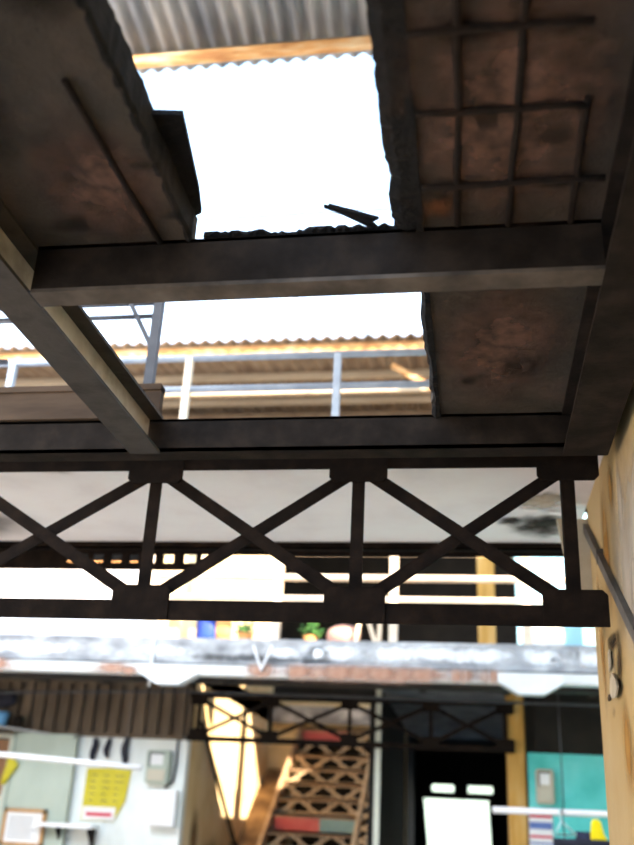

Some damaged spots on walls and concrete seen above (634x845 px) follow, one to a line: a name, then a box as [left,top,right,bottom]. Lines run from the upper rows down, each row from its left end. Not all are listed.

leakage [501,516,558,535]
leakage [0,641,68,654]
leakage [204,648,299,663]
leakage [323,646,359,661]
leakage [370,647,558,666]
leakage [573,651,597,667]
rust [99,663,135,674]